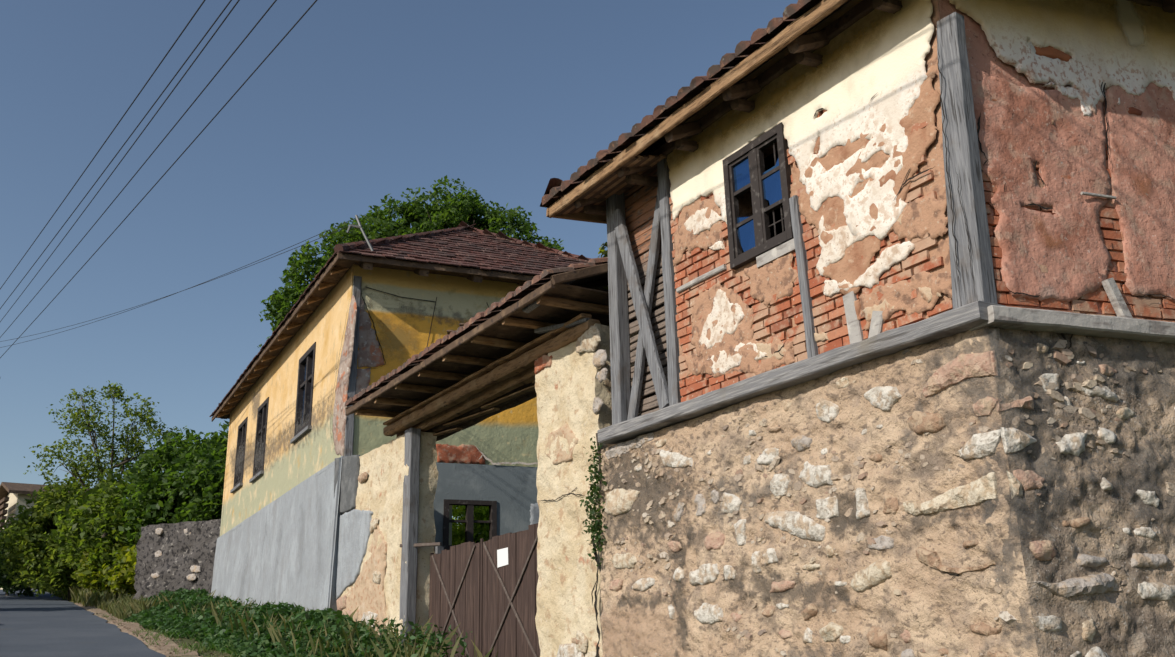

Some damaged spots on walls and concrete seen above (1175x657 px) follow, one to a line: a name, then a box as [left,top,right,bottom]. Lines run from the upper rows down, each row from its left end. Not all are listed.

crack [1101,82,1111,163]
flaking render [332,295,385,456]
flaking render [342,525,387,635]
crack [536,487,600,657]